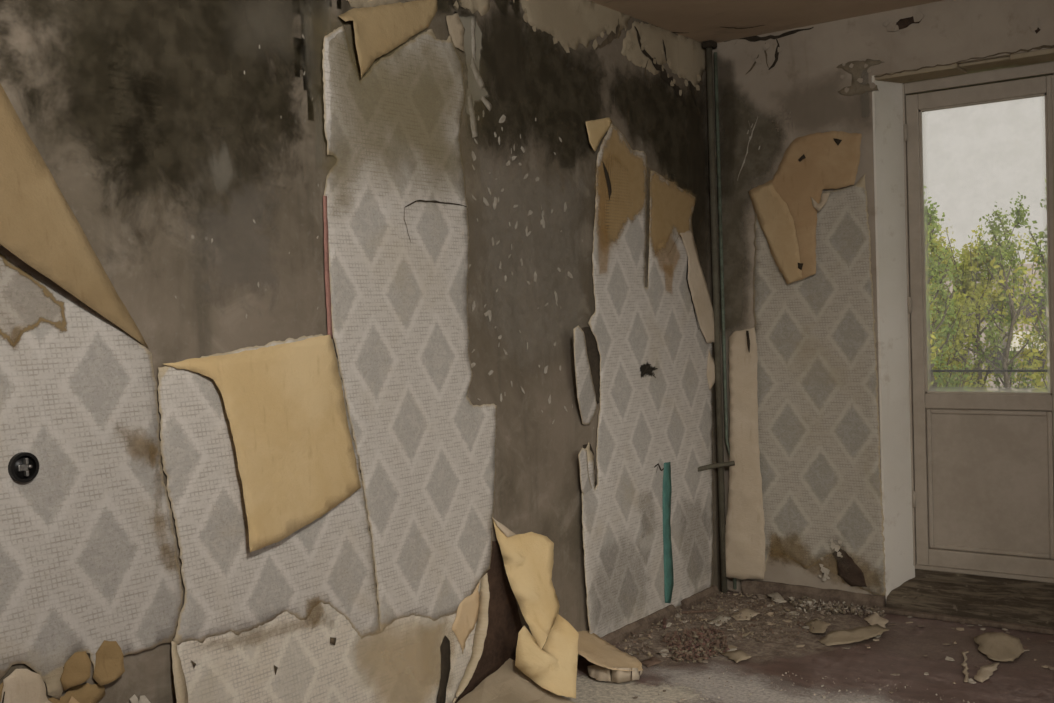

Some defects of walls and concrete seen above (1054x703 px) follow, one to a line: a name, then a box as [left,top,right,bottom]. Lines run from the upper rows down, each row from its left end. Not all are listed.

leakage [0,0,330,200]
peeling [338,0,437,78]
peeling [453,0,490,16]
peeling [509,0,706,90]
crack [596,19,697,107]
crack [723,25,814,74]
peeling [0,83,149,349]
leakage [437,0,782,333]
peeling [748,131,862,284]
leakage [0,254,67,347]
peeling [164,335,361,552]